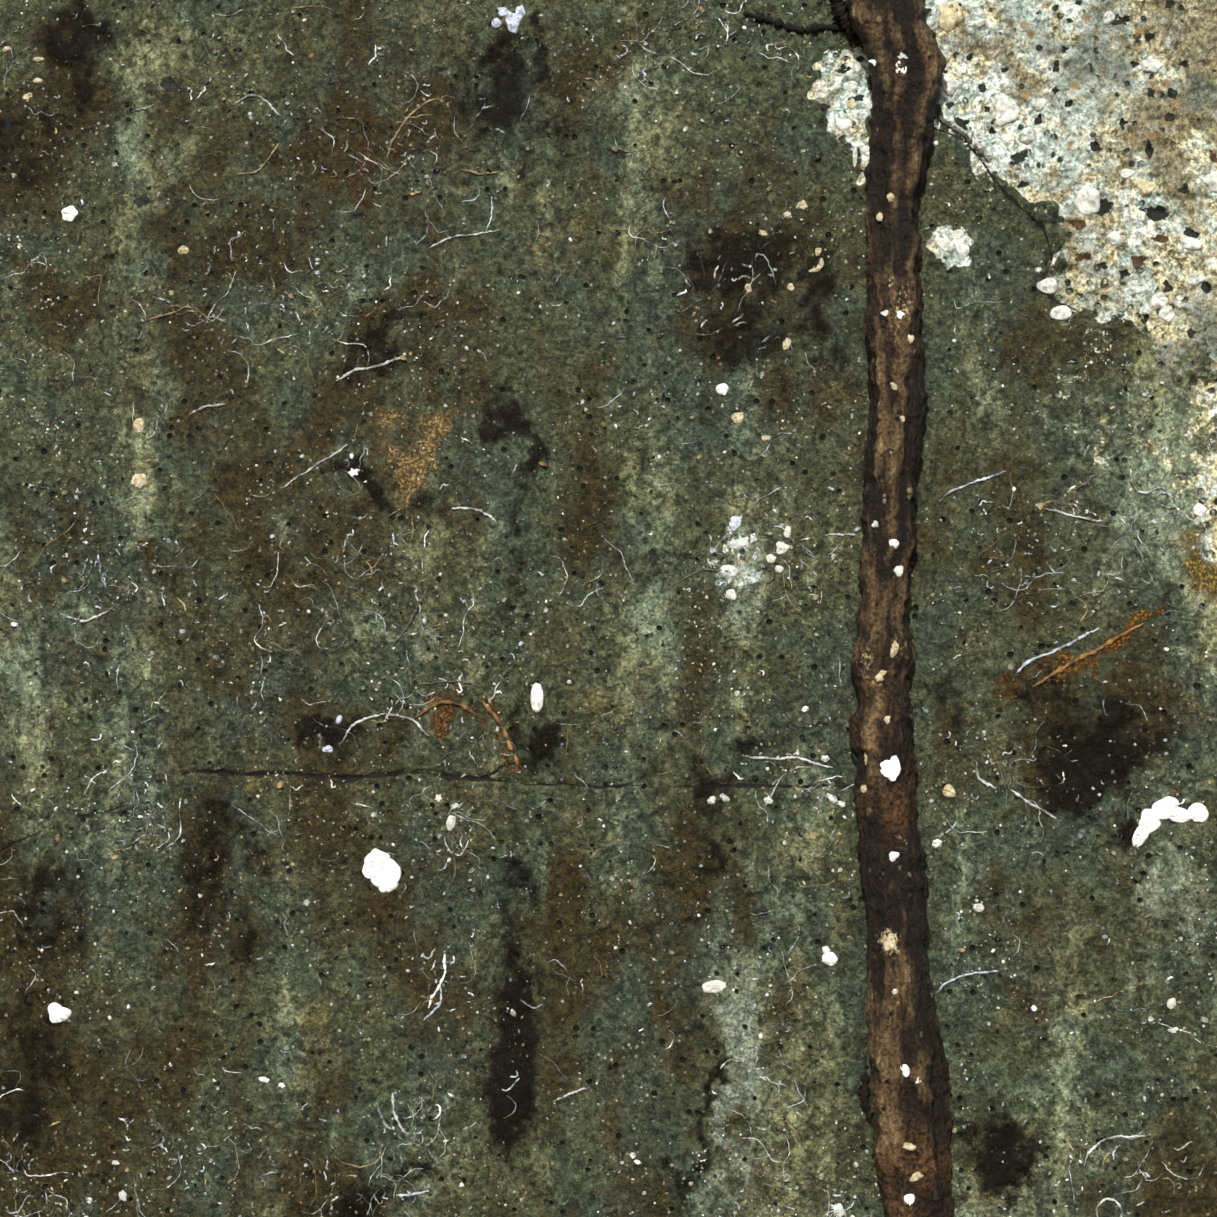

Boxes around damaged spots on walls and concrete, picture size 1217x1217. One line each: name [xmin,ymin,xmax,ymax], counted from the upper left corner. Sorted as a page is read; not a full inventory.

spalling [807,47,872,186]
damp [688,228,850,383]
crack [933,127,1083,314]
spalling [925,0,1217,572]
rust [997,607,1164,698]
crack [182,762,853,789]
damp [1014,672,1181,820]
damp [1118,816,1138,849]
damp [482,855,540,1162]